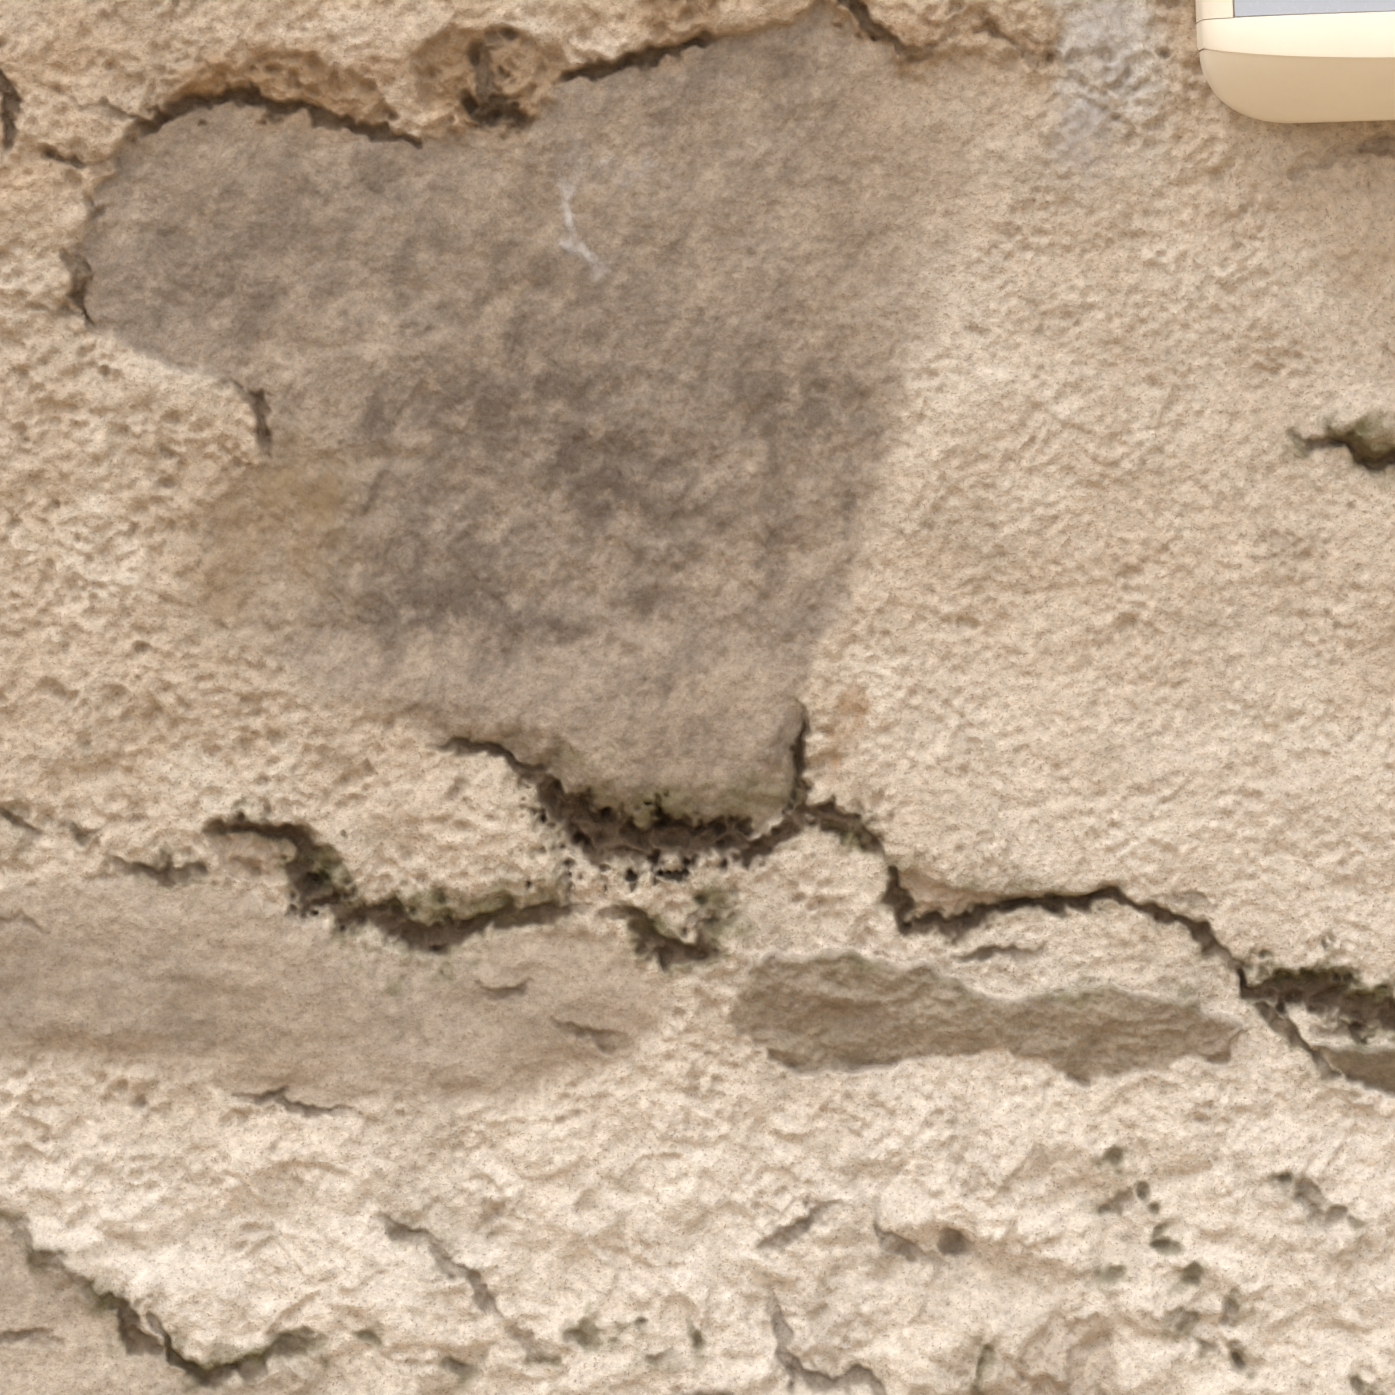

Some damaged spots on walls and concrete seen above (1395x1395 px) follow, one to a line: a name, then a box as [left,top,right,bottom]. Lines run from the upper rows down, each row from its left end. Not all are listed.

spalling [639,0,721,46]
spalling [170,50,400,125]
spalling [409,22,571,134]
damp [562,185,593,260]
damp [547,422,688,528]
crack [1286,409,1395,474]
crack [0,700,1395,1084]
crack [231,1085,355,1121]